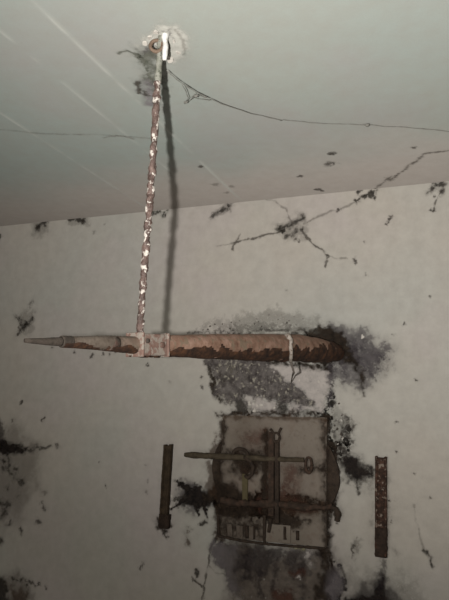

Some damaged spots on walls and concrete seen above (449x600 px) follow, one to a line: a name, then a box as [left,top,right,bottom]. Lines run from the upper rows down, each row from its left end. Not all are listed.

crack [354,151,444,203]
crack [232,215,329,267]
spalling [204,359,354,455]
leakage [0,439,51,475]
leakage [340,446,373,495]
leakage [210,540,332,600]